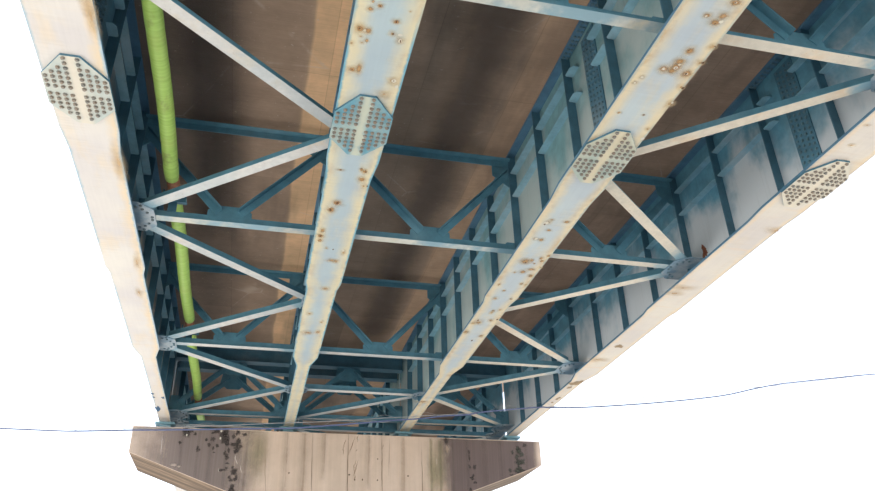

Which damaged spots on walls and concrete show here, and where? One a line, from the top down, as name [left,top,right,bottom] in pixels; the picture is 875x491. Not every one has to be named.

corrosion [661,49,693,76]